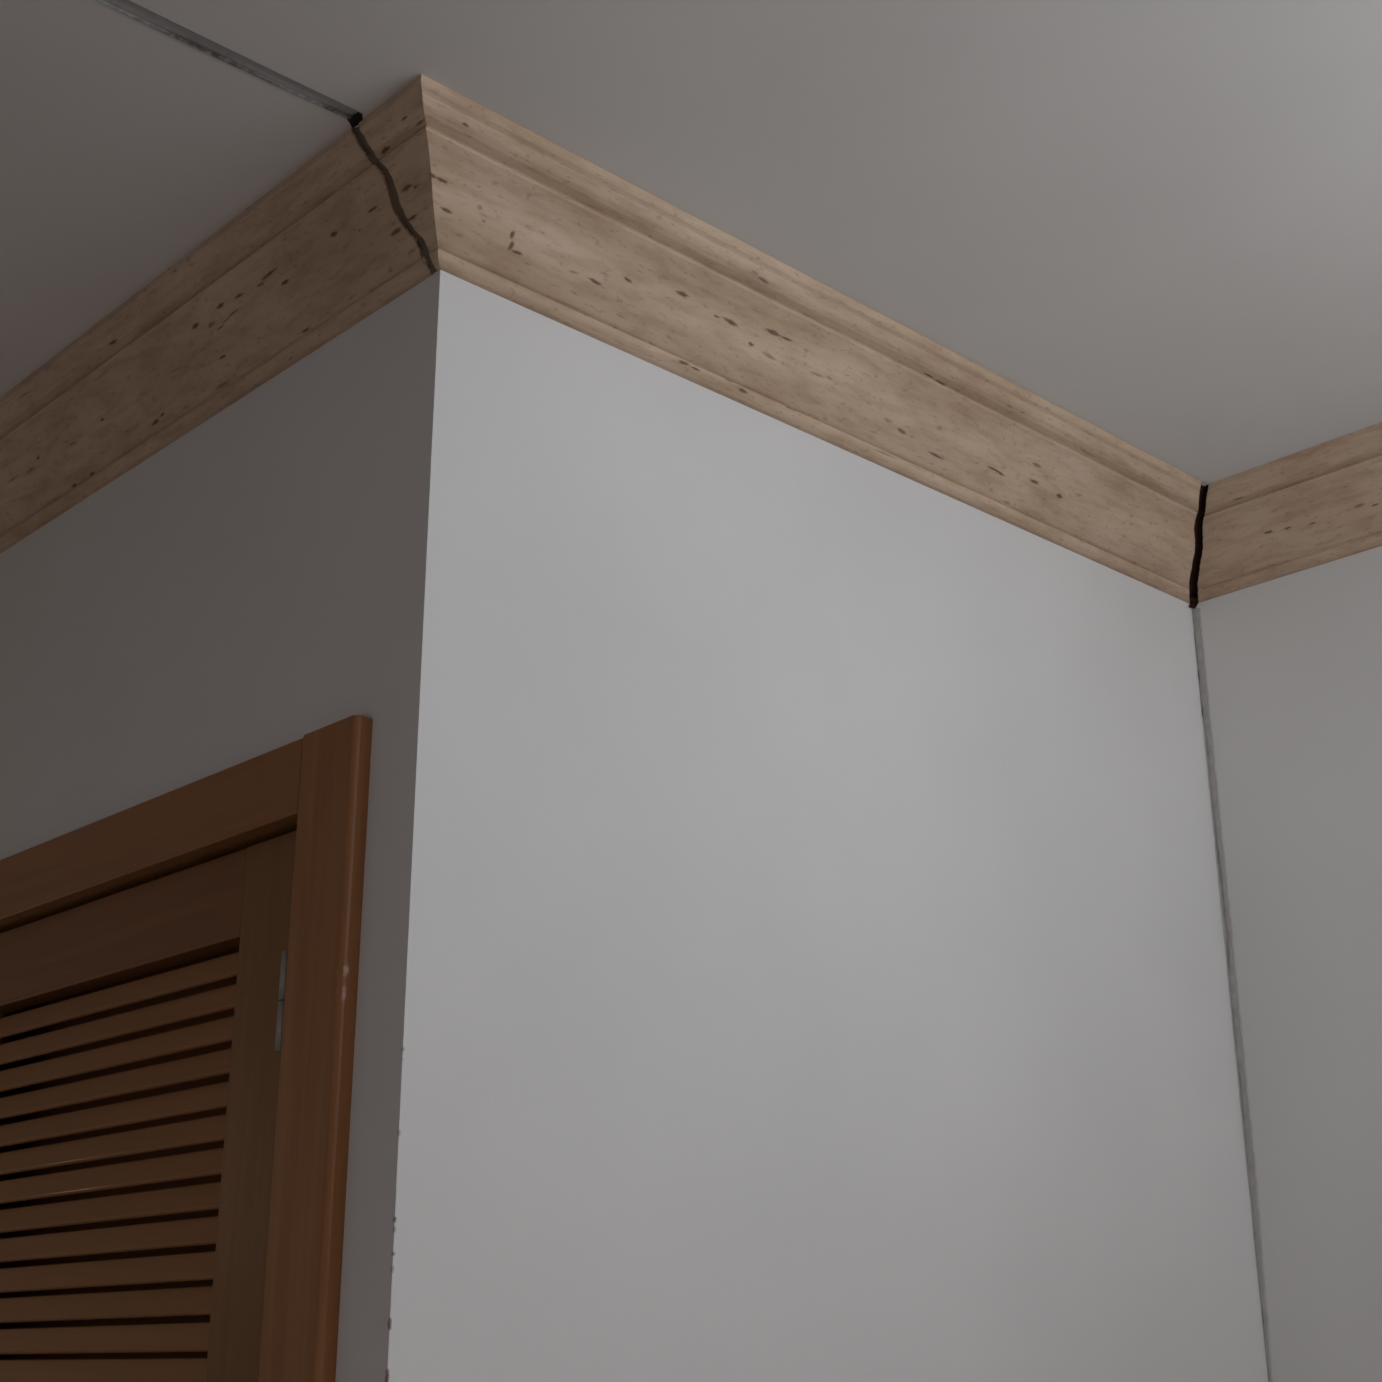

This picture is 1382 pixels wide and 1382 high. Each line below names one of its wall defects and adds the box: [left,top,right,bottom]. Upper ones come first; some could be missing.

crack [96,0,437,275]
crack [1189,484,1269,1377]